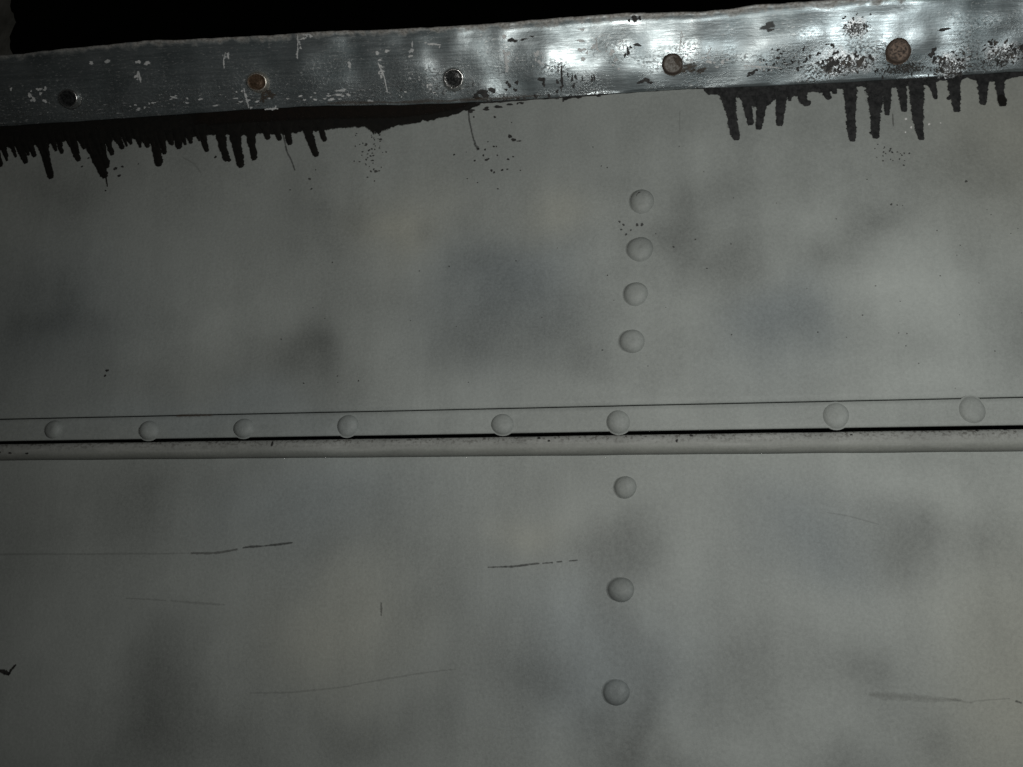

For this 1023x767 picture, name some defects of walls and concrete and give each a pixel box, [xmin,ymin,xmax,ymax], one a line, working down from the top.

corrosion [673,57,706,76]
leakage [719,76,962,142]
leakage [976,75,1007,106]
leakage [0,102,467,187]